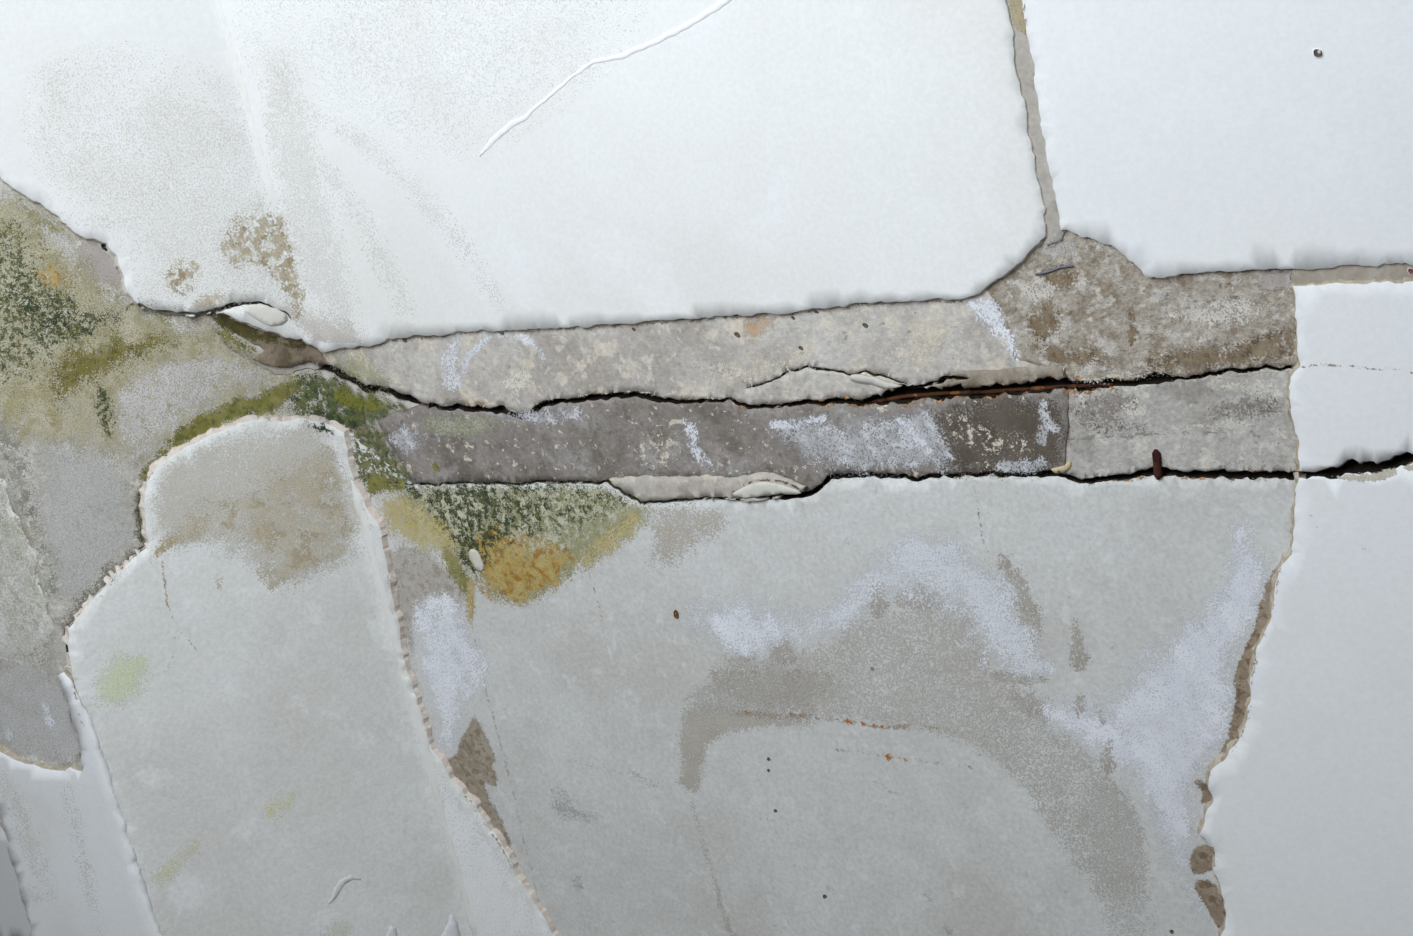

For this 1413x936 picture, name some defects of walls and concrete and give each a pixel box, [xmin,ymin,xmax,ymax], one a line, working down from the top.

spalling [0,180,330,767]
water stain [0,353,372,605]
water stain [388,331,586,457]
water stain [681,417,714,472]
crack [47,294,1412,420]
crack [384,452,1413,506]
water stain [769,389,1145,480]
spalling [1210,615,1256,696]
water stain [675,519,1275,936]
spalling [1178,771,1214,863]